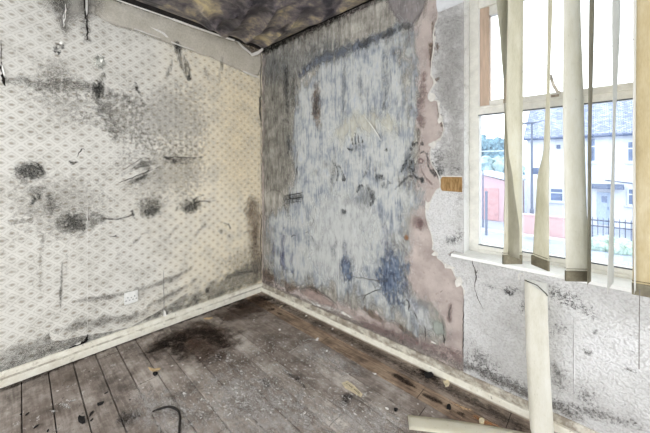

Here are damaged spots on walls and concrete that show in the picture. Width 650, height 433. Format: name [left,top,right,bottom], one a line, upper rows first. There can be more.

water stain [49,0,381,80]
water stain [18,74,129,123]
water stain [312,84,320,125]
water stain [16,162,46,180]
peeling [117,0,446,345]
water stain [57,214,103,232]
crack [443,261,483,348]
water stain [0,330,118,369]
water stain [552,392,637,424]